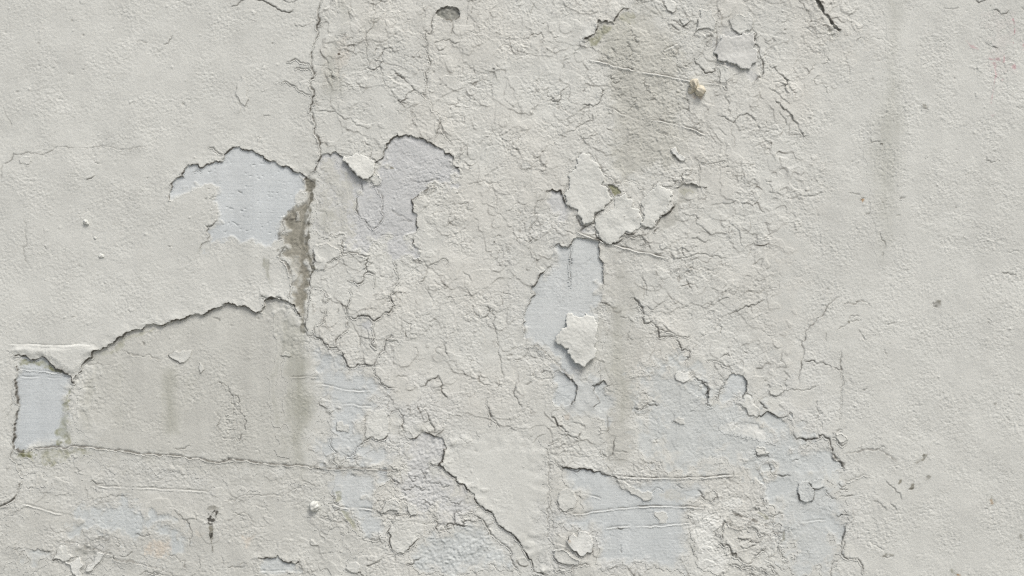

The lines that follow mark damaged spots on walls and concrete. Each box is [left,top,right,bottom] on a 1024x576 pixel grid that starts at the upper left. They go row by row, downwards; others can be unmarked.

crack [281,0,503,189]
crack [523,32,605,125]
peeling [575,0,791,95]
crack [717,94,761,133]
crack [340,238,473,289]
crack [611,157,742,341]
crack [386,374,452,433]
peeling [0,64,854,576]
crack [473,305,532,429]
crack [633,402,686,426]
crack [713,297,766,358]
crack [776,295,903,512]